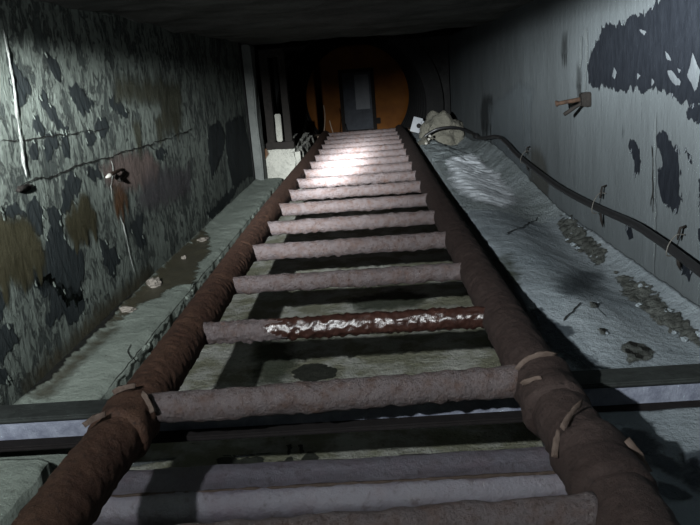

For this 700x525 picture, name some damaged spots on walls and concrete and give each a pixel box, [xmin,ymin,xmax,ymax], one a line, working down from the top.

peeling [587,0,700,125]
crack [2,128,107,148]
crack [22,101,192,185]
peeling [628,139,641,178]
peeling [656,130,692,214]
leakage [0,217,45,309]
spalling [557,214,608,265]
spalling [614,271,700,347]
spalling [620,341,654,364]